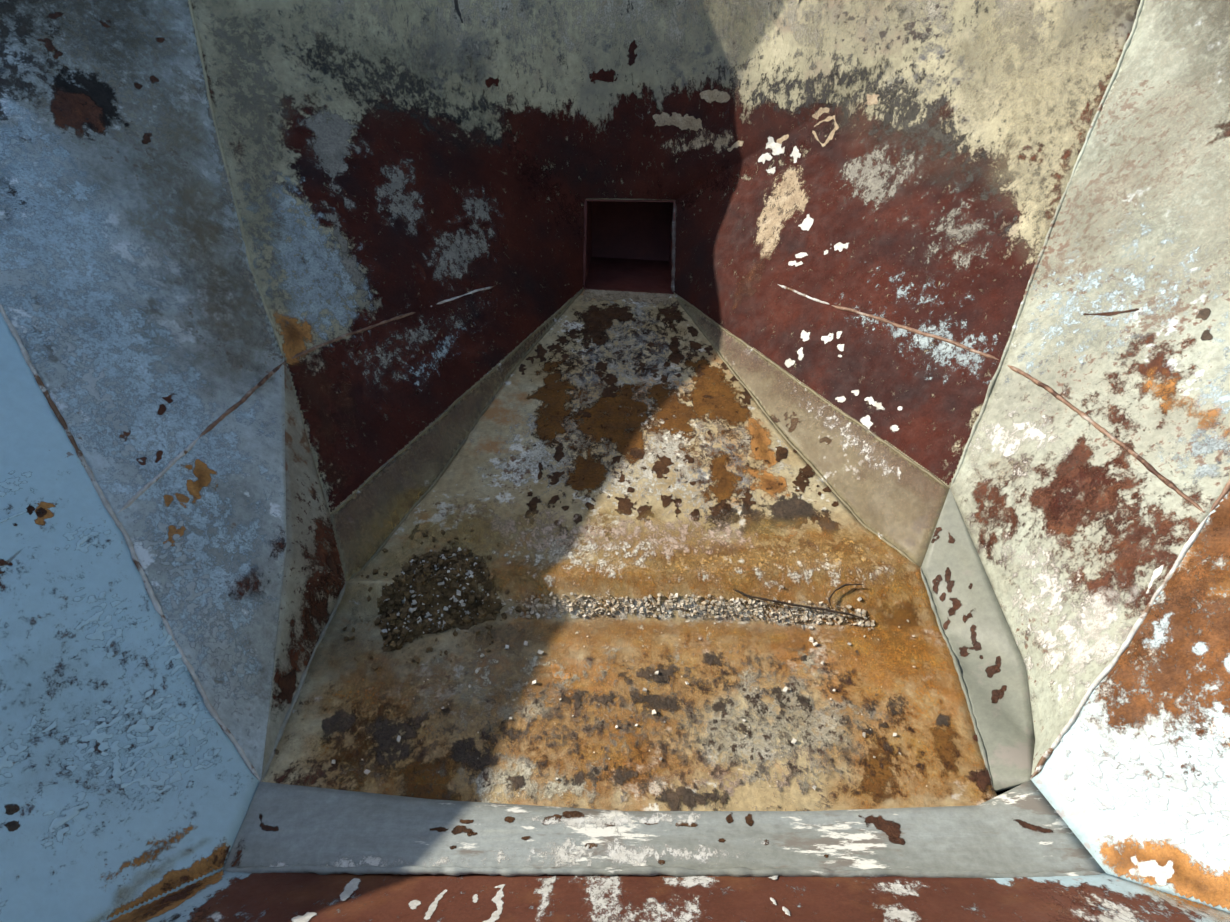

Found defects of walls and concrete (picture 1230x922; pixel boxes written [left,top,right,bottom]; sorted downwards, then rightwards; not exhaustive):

rust [37,38,152,144]
peeling [196,33,1130,512]
rust [540,358,792,509]
rust [965,334,1230,781]
rust [270,511,991,811]
rust [105,802,245,922]
peeling [430,819,477,849]
peeling [543,811,584,825]
peeling [160,859,1206,922]
peeling [726,813,754,826]
peeling [858,815,905,845]
rust [1100,835,1230,920]